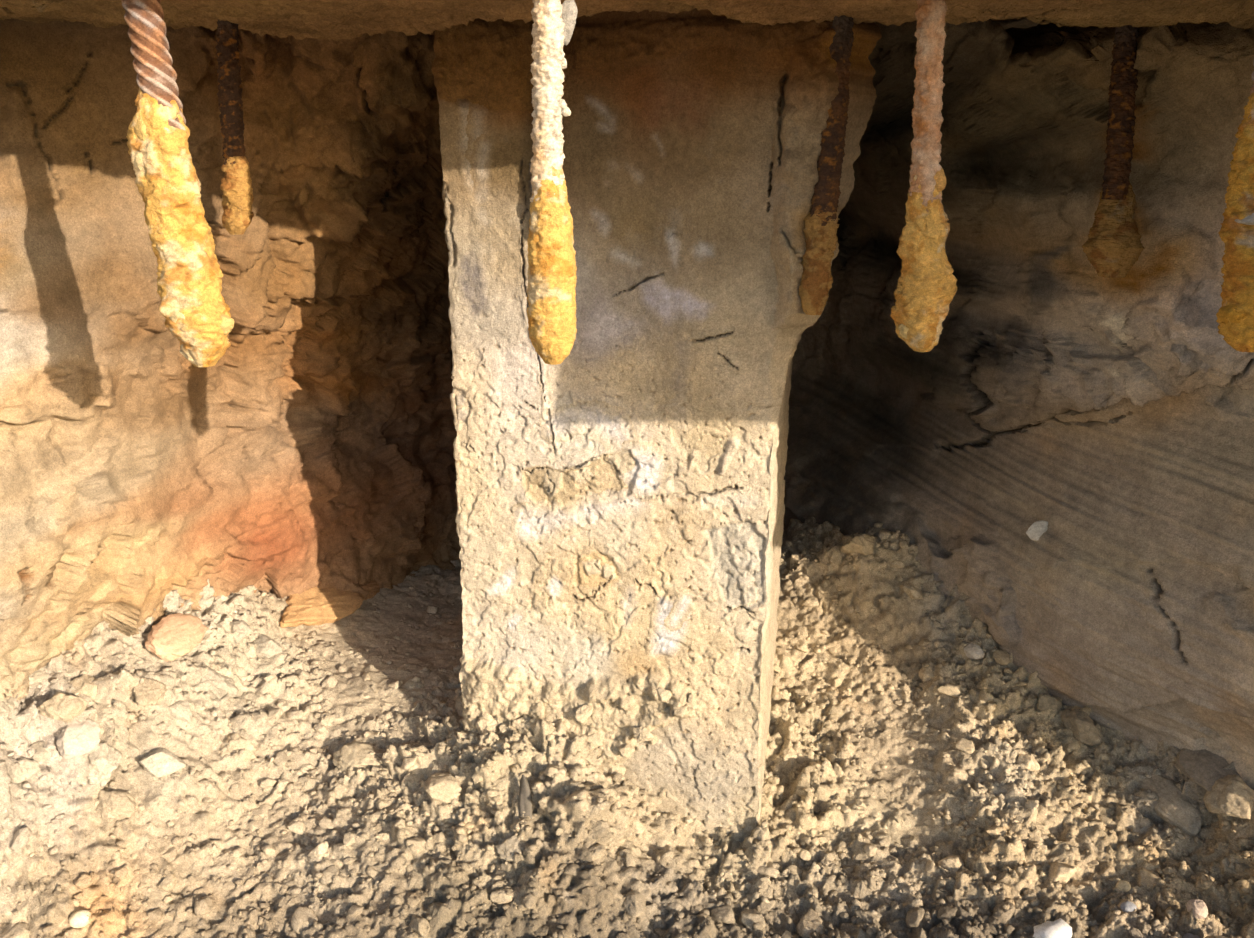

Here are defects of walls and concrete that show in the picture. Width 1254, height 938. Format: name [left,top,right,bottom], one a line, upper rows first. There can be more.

spalling [122,0,254,367]
spalling [443,179,458,268]
spalling [452,385,473,426]
crack [519,160,555,474]
spalling [798,15,854,315]
rust [815,25,882,76]
spalling [890,0,957,352]
spalling [1026,521,1048,541]
spalling [1019,25,1145,320]
spalling [1216,60,1254,352]